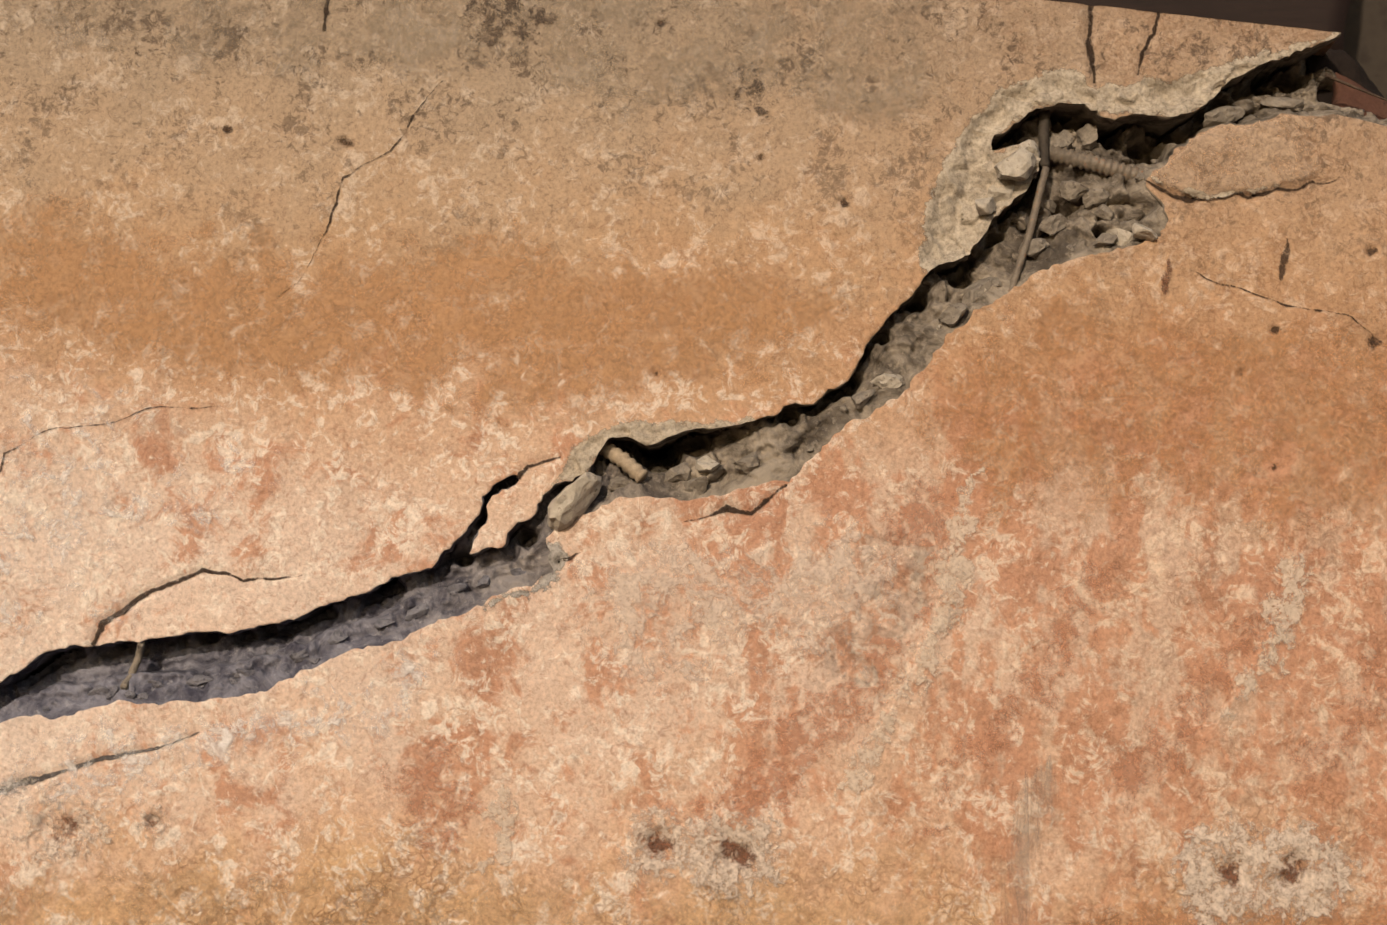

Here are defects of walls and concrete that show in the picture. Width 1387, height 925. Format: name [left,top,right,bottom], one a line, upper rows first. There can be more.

crack [1085,5,1096,83]
crack [1138,11,1160,72]
spalling [918,32,1340,292]
crack [0,54,1387,794]
damp [1168,813,1365,925]